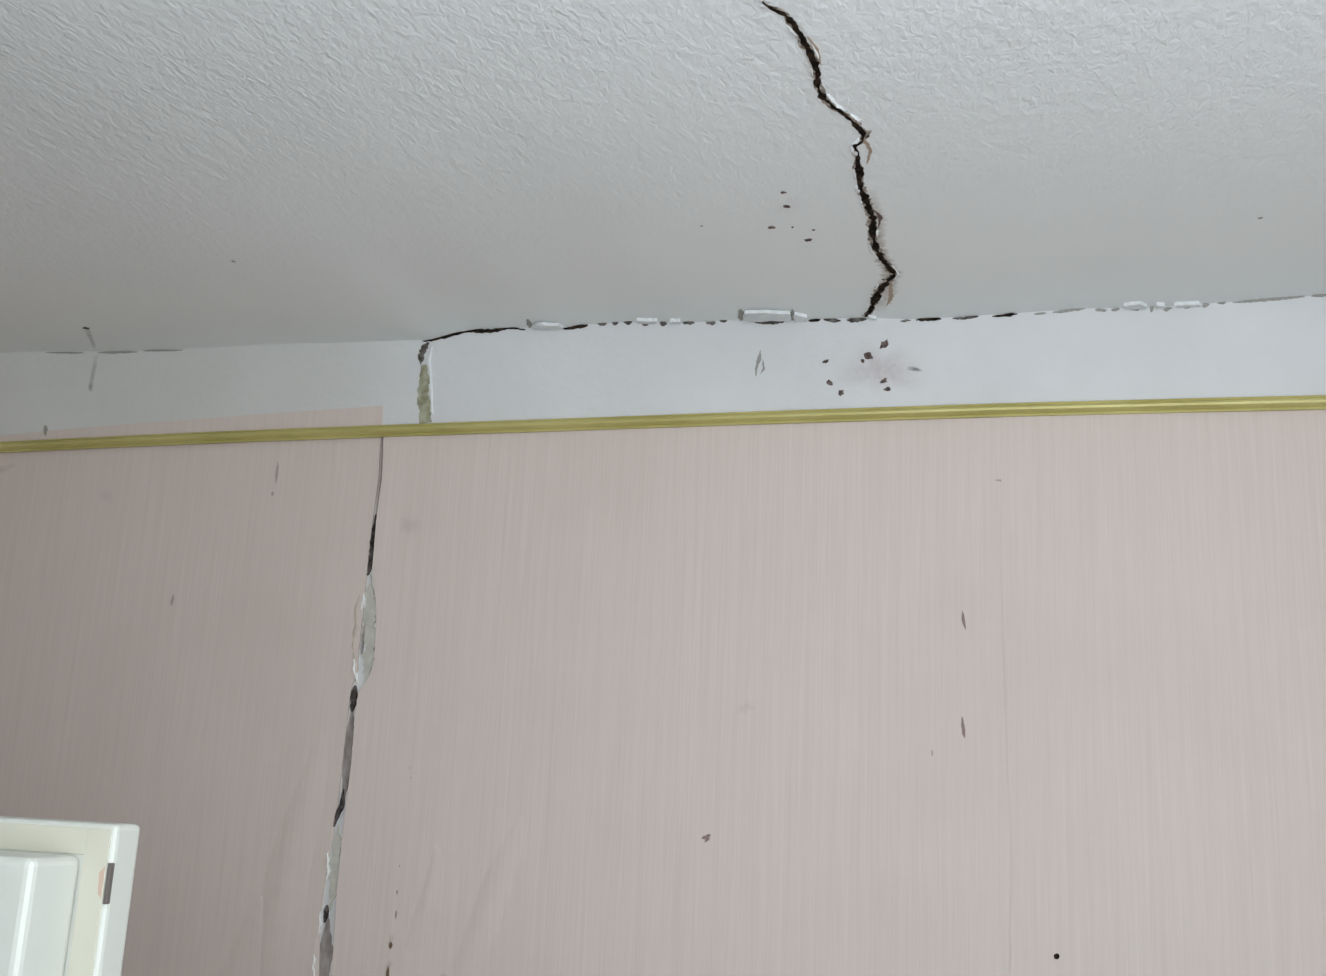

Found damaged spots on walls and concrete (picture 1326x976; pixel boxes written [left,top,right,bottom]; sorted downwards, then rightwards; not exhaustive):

crack [417,0,1326,424]
crack [312,437,383,976]